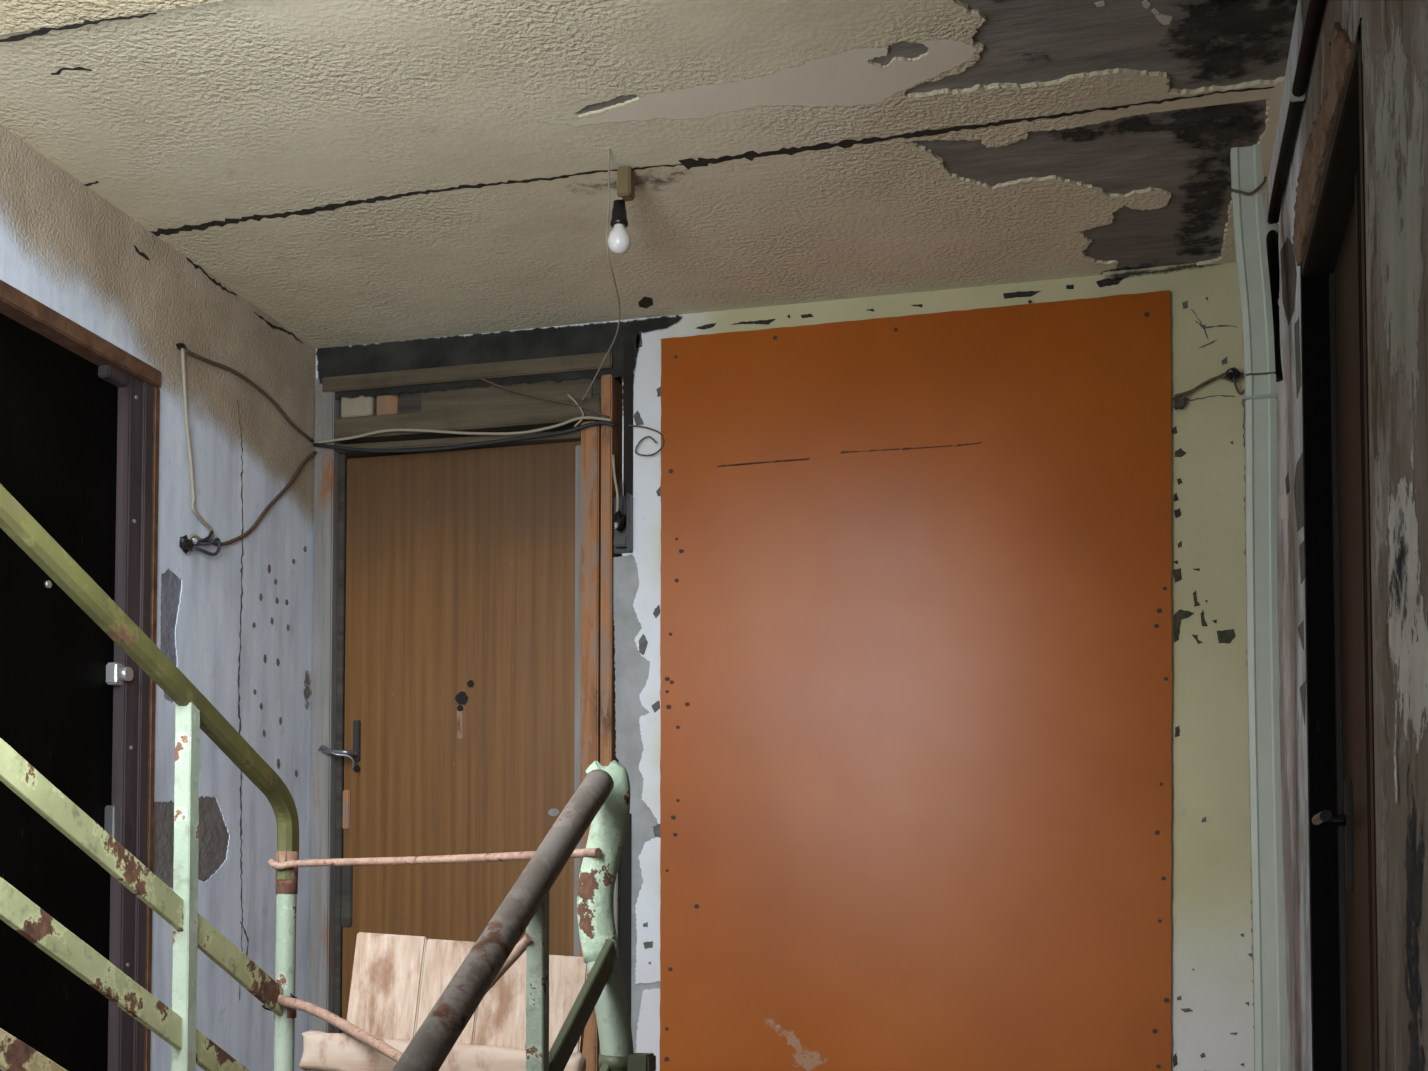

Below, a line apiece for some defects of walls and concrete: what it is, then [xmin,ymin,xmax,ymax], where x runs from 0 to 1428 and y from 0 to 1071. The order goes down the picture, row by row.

crack [50,67,92,75]
crack [0,13,157,42]
spalling [872,41,929,65]
spalling [906,0,1297,93]
mould [1166,0,1298,83]
crack [134,86,1274,348]
spalling [912,99,1268,287]
damp [1054,103,1263,279]
damp [1389,527,1408,614]
spalling [1174,591,1236,644]
flaking render [613,555,660,1053]
damp [1394,699,1425,1071]